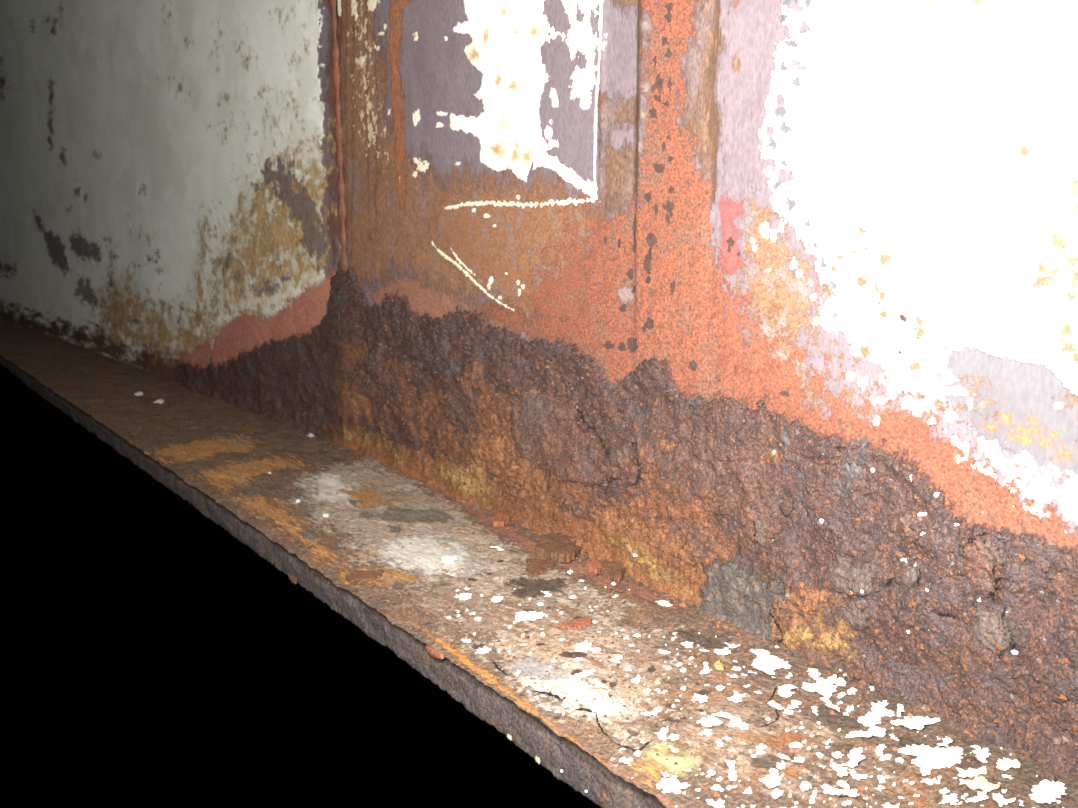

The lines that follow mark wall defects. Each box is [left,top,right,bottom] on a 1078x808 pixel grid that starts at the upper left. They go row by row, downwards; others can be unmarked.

peeling [222,253,290,296]
rust [0,0,643,383]
peeling [255,0,1078,554]
rust [677,0,738,207]
rust [425,178,1078,599]
rust [143,434,934,808]